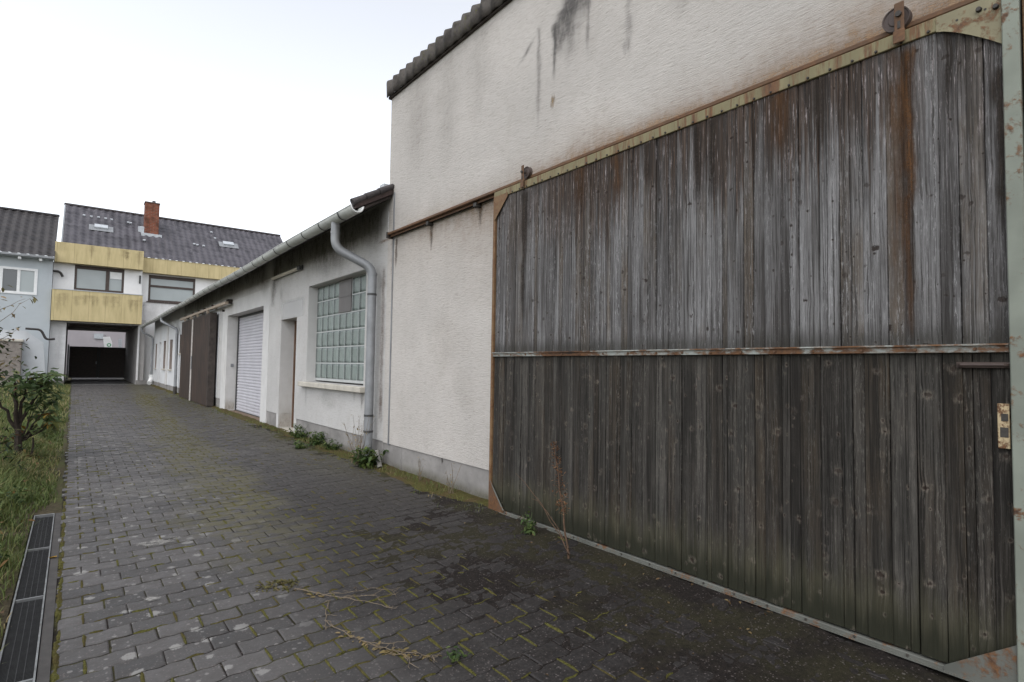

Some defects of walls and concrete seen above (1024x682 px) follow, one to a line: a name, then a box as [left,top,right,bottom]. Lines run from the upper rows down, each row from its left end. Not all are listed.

water stain [553,0,584,63]
corrosion [743,26,886,88]
corrosion [911,0,963,21]